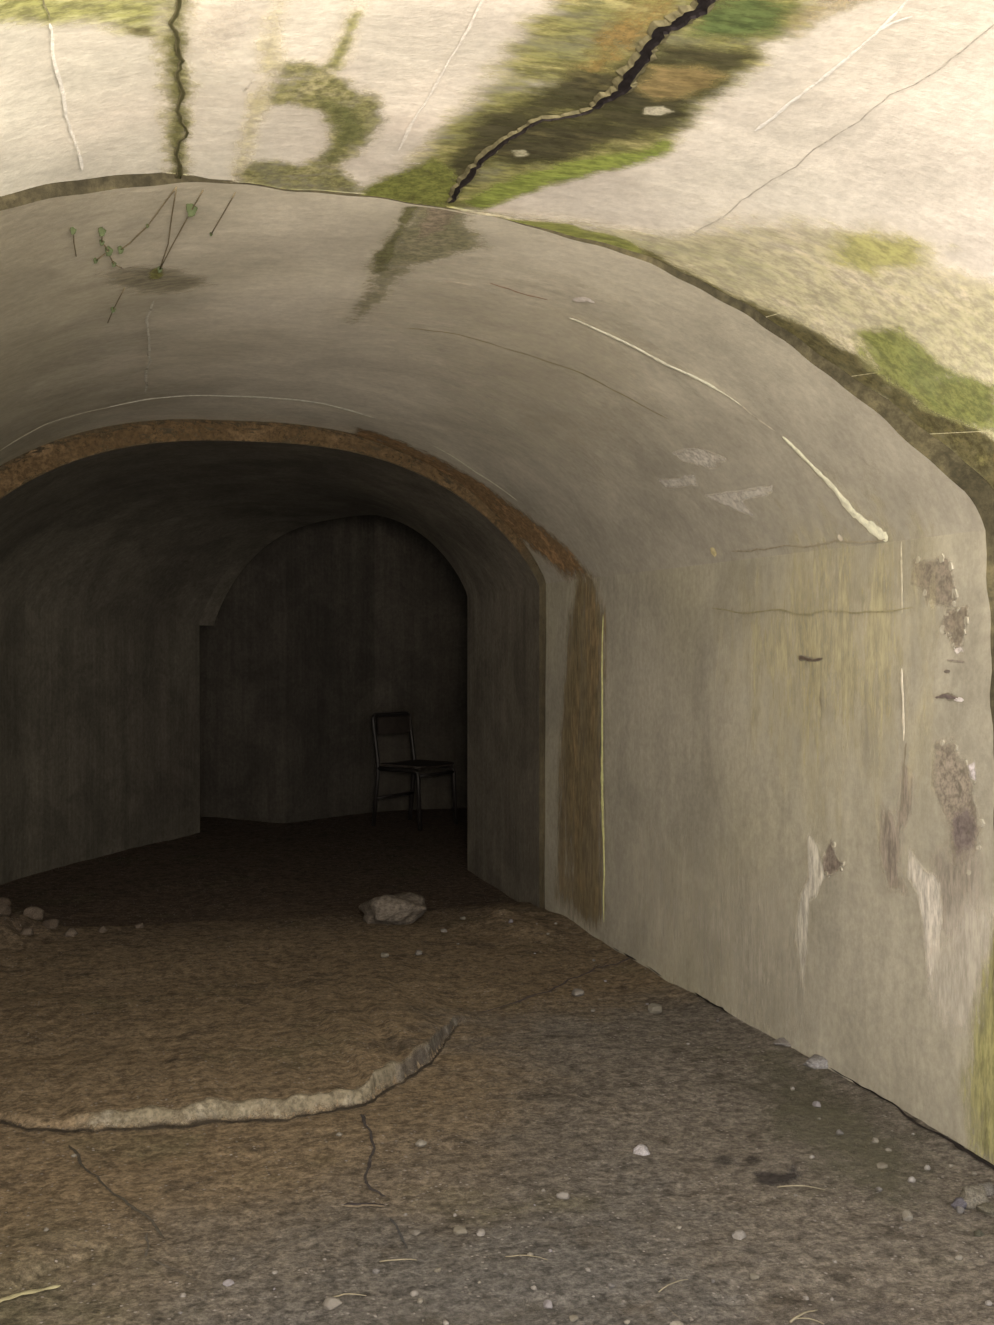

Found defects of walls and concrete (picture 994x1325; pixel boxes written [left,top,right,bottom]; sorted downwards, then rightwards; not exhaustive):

crack [168,0,189,179]
crack [447,0,719,203]
water stain [353,0,858,320]
peeling [911,554,969,673]
peeling [935,693,964,702]
peeling [879,766,913,892]
peeling [931,740,985,947]